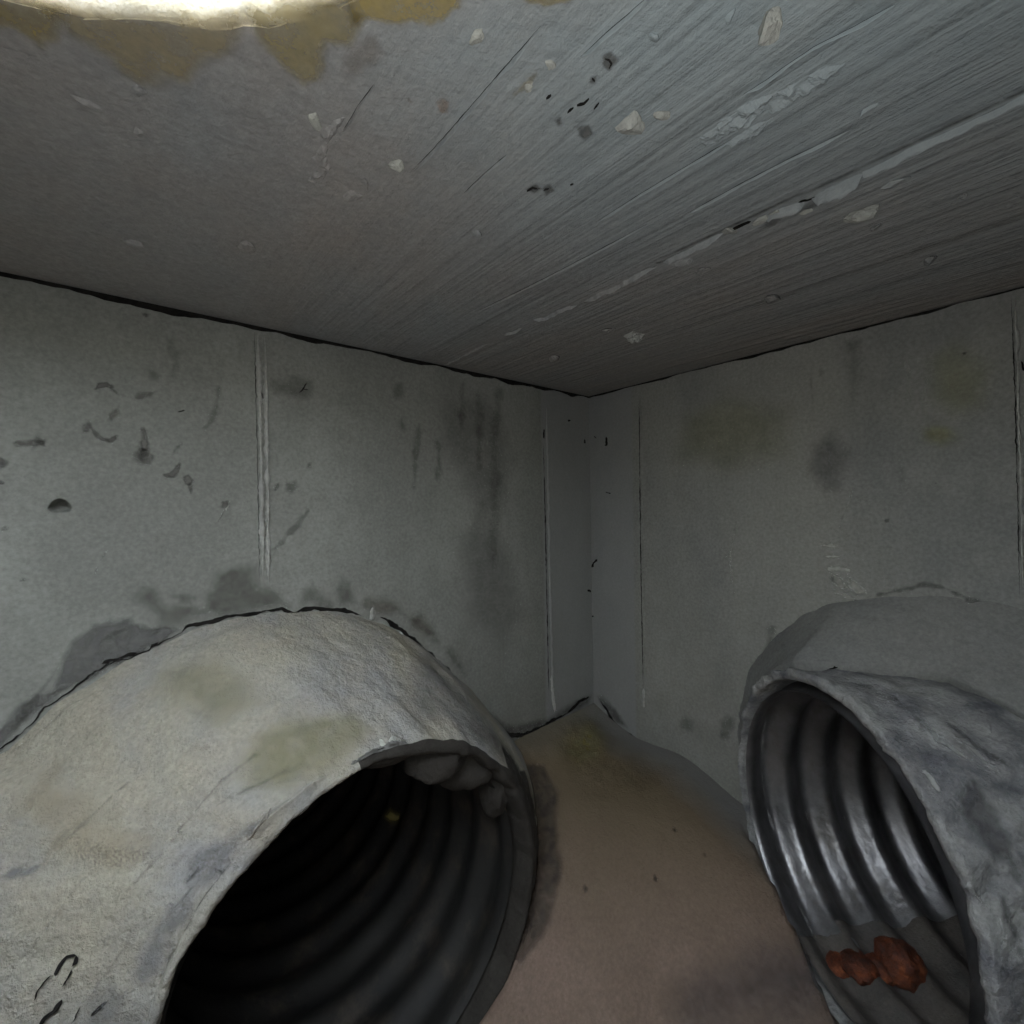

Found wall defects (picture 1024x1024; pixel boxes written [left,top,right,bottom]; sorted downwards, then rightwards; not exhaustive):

spalling [603,53,616,69]
spalling [700,63,846,147]
spalling [615,110,670,135]
spalling [843,204,880,224]
rust [826,935,928,994]